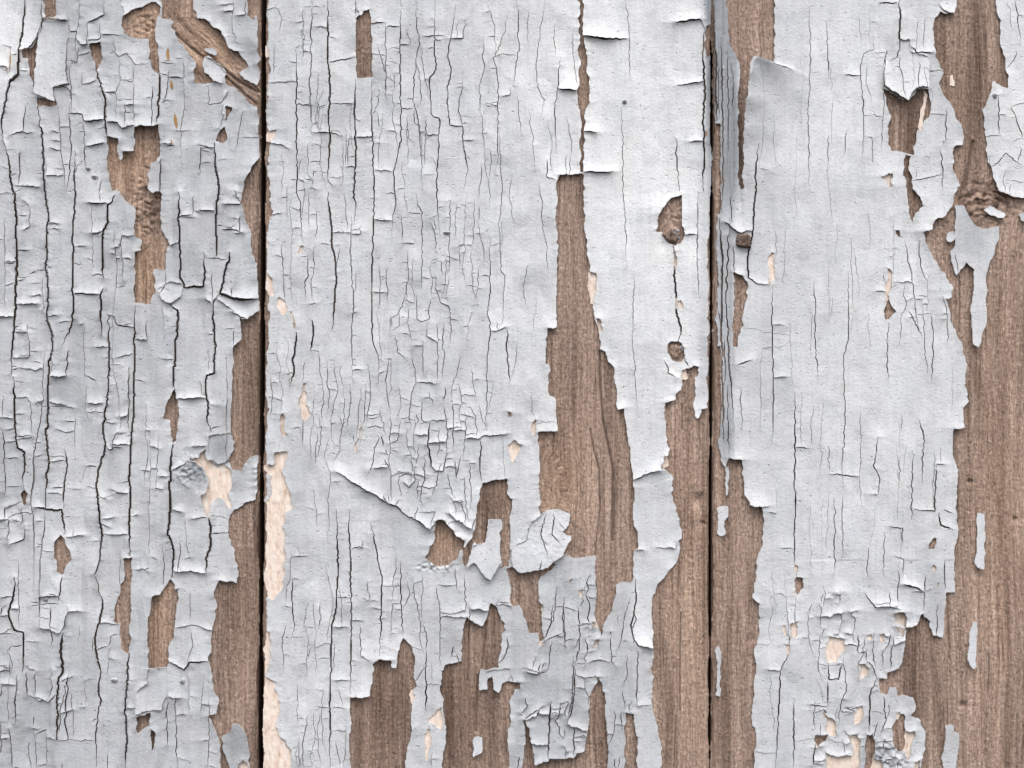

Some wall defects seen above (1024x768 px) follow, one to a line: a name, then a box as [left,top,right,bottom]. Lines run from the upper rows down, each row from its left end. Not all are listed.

peeling [107,124,183,305]
peeling [119,0,276,277]
peeling [206,290,272,768]
crack [0,2,636,768]
peeling [349,638,418,768]
peeling [426,0,638,768]
crack [523,360,657,768]
peeling [651,122,765,768]
peeling [726,0,775,189]
crack [664,0,960,767]
peeling [863,0,1024,768]
crack [915,95,1022,190]